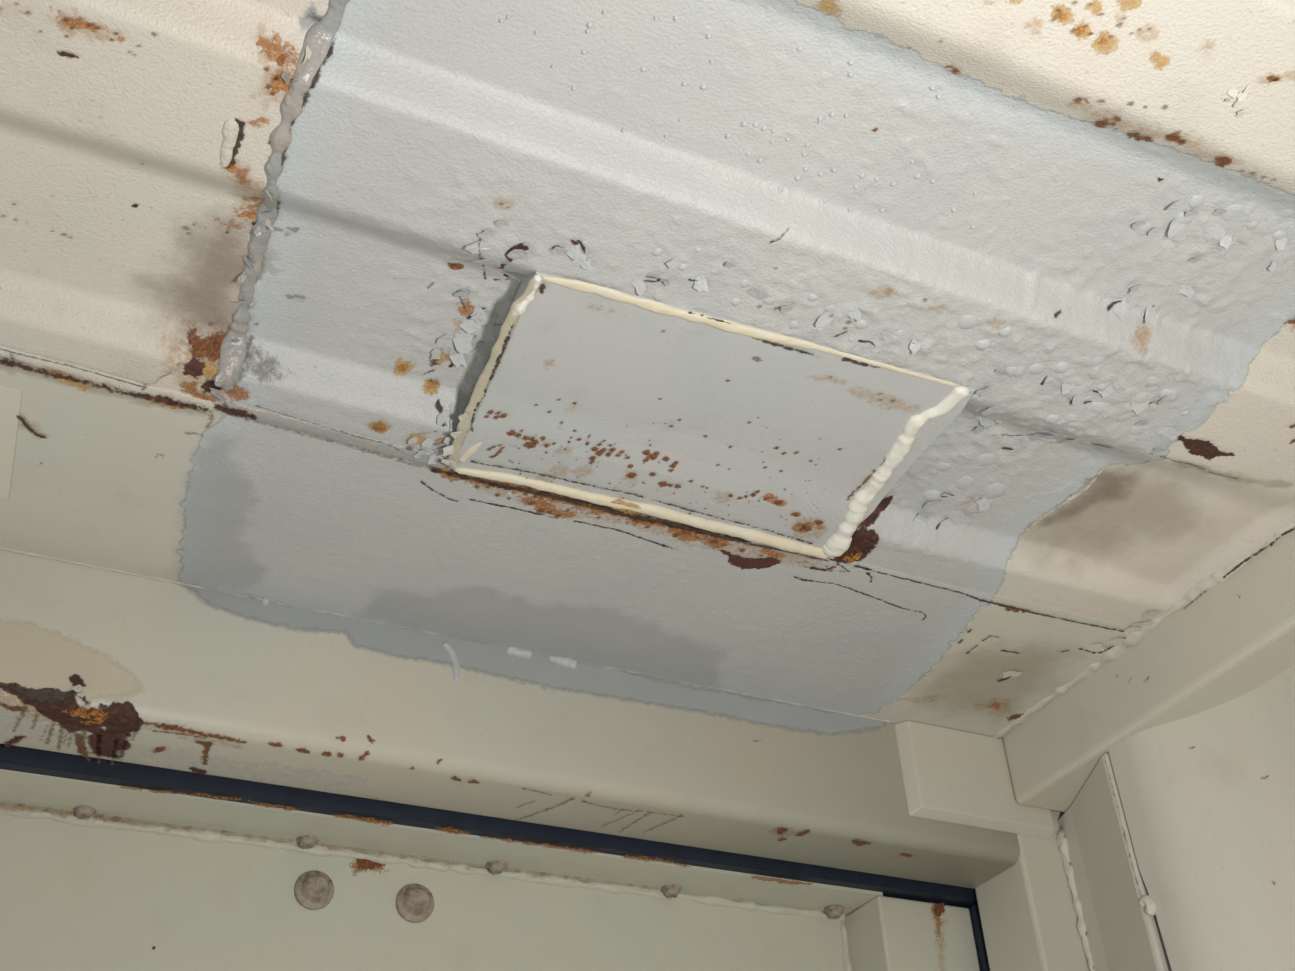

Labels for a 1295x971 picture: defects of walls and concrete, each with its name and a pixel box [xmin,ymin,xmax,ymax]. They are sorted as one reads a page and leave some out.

rust [1052,0,1151,55]
rust [256,35,299,95]
peeling [220,118,245,169]
crack [689,312,877,368]
rust [0,322,444,461]
peeling [408,399,469,467]
peeling [1177,435,1235,460]
rust [429,399,845,572]
peeling [720,550,780,569]
crack [420,324,1125,682]
peeling [830,496,893,564]
rust [0,674,247,774]